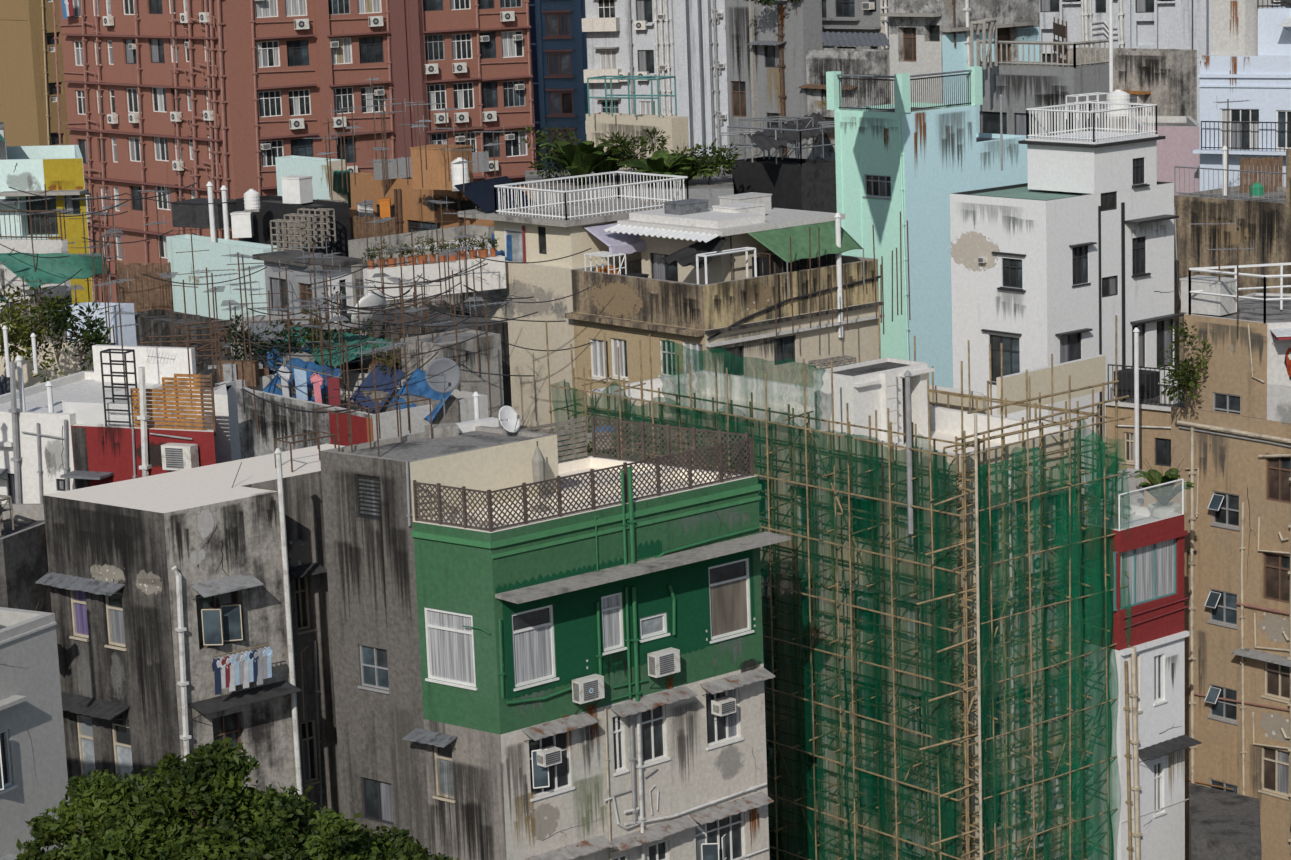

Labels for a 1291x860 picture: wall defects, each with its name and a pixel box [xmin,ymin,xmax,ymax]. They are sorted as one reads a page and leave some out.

corrosion [914,113,926,159]
leakage [1192,200,1277,261]
leakage [650,283,695,318]
leakage [715,270,817,312]
leakage [1199,324,1263,359]
leakage [339,474,408,597]
leakage [135,608,162,714]
leakage [506,745,534,836]
leakage [581,725,604,830]